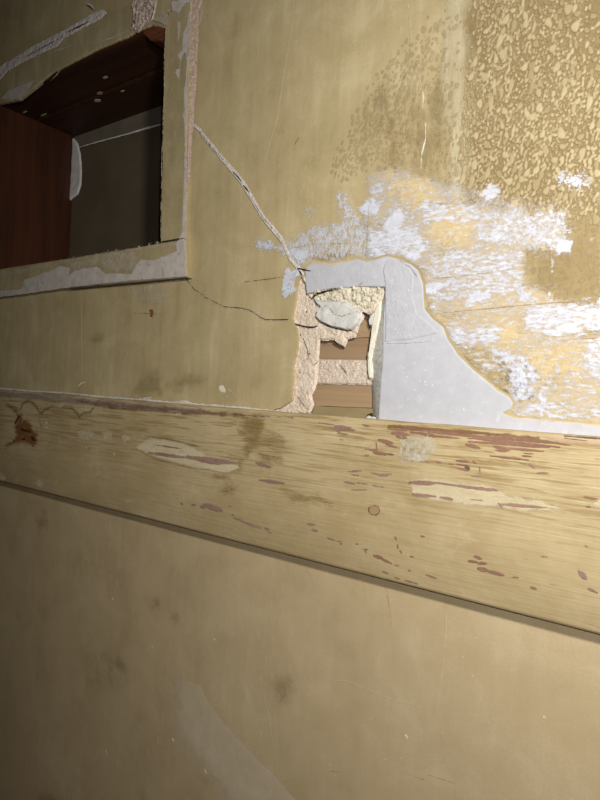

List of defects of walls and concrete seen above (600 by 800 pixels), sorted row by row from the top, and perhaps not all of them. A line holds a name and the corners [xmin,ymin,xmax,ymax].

peeling [0,0,202,307]
crack [194,124,310,283]
water stain [362,0,600,350]
crack [186,279,318,328]
peeling [0,161,600,440]
corrosion [5,403,38,449]
peeling [137,436,240,473]
peeling [365,424,600,514]